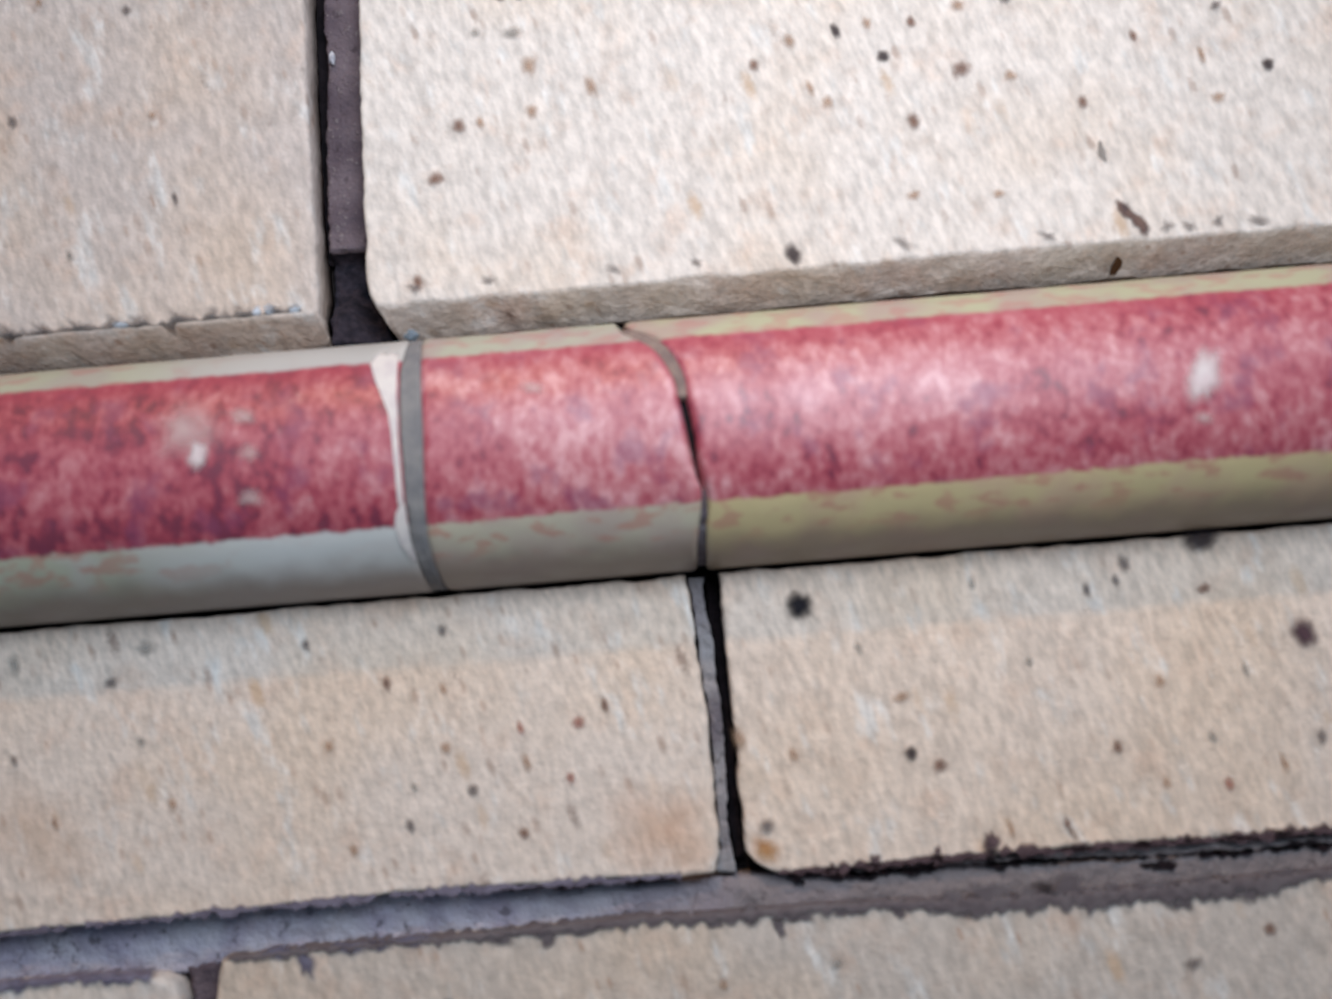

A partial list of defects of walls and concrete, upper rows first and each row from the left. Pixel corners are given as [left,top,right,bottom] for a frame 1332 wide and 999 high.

crack [620,330,745,859]
crack [500,876,704,892]